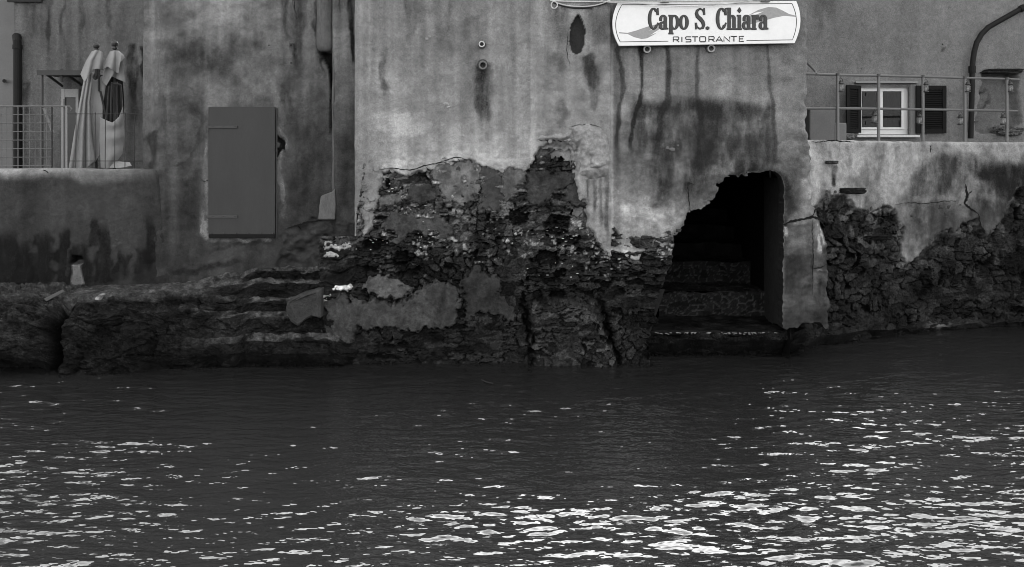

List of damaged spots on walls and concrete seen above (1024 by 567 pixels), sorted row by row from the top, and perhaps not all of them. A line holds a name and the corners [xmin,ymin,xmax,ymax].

damp [583,54,597,84]
damp [615,46,775,191]
damp [0,221,154,285]
spalling [321,139,682,344]
spalling [815,188,1024,305]
crack [895,184,986,234]